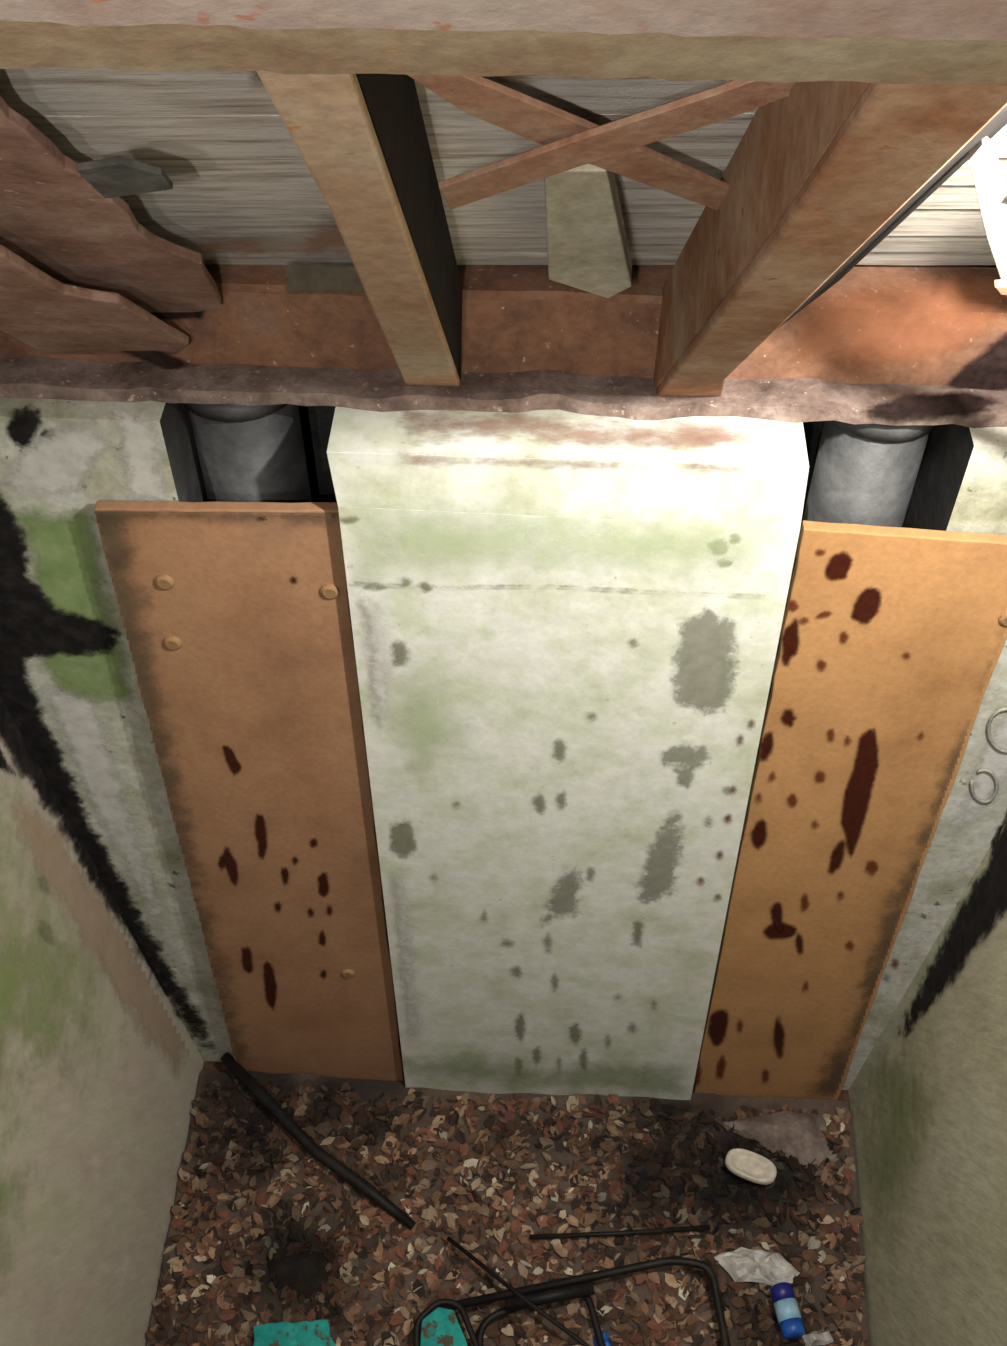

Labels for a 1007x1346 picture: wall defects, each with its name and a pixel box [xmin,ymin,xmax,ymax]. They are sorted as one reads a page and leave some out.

damp [7,406,54,447]
damp [817,550,852,580]
damp [672,610,735,713]
damp [782,600,831,665]
damp [852,588,881,623]
damp [0,494,214,1049]
damp [760,733,776,780]
damp [828,728,878,874]
damp [391,823,416,857]
damp [639,815,681,903]
damp [764,902,803,953]
damp [898,813,1007,1038]